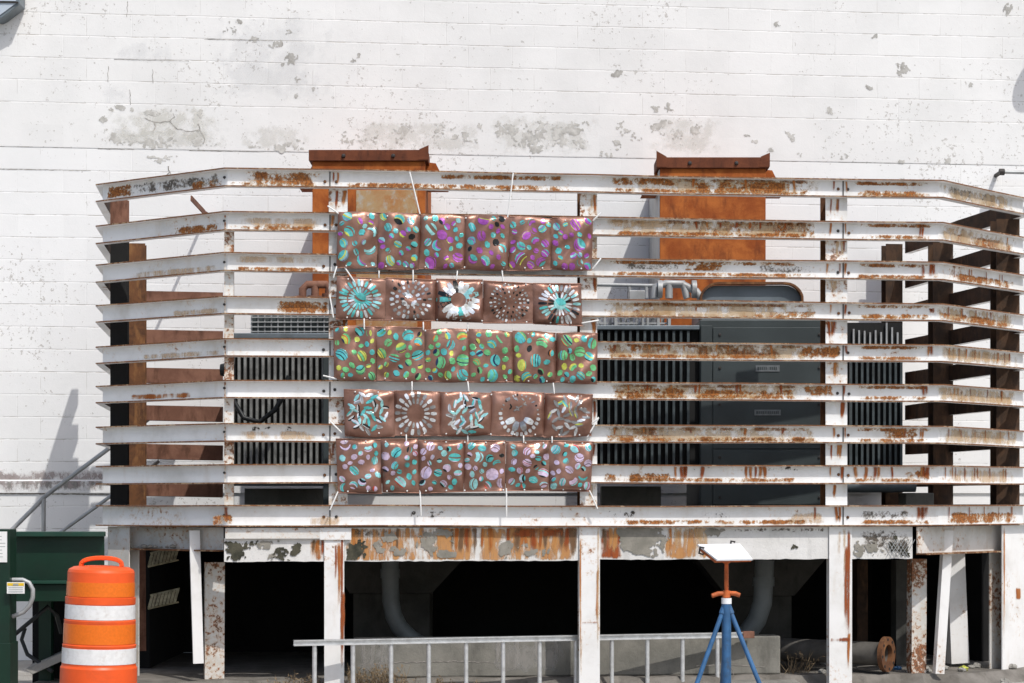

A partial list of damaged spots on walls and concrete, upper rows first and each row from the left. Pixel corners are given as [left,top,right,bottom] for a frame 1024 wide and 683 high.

crack [129,90,207,151]
corrosion [108,184,131,198]
corrosion [192,171,319,189]
corrosion [613,178,812,195]
corrosion [829,181,927,233]
corrosion [603,305,1016,520]
spalling [224,540,302,561]
spalling [346,529,457,560]
spalling [616,527,671,558]
spalling [705,528,725,537]
spalling [853,535,910,558]
corrosion [831,532,850,663]